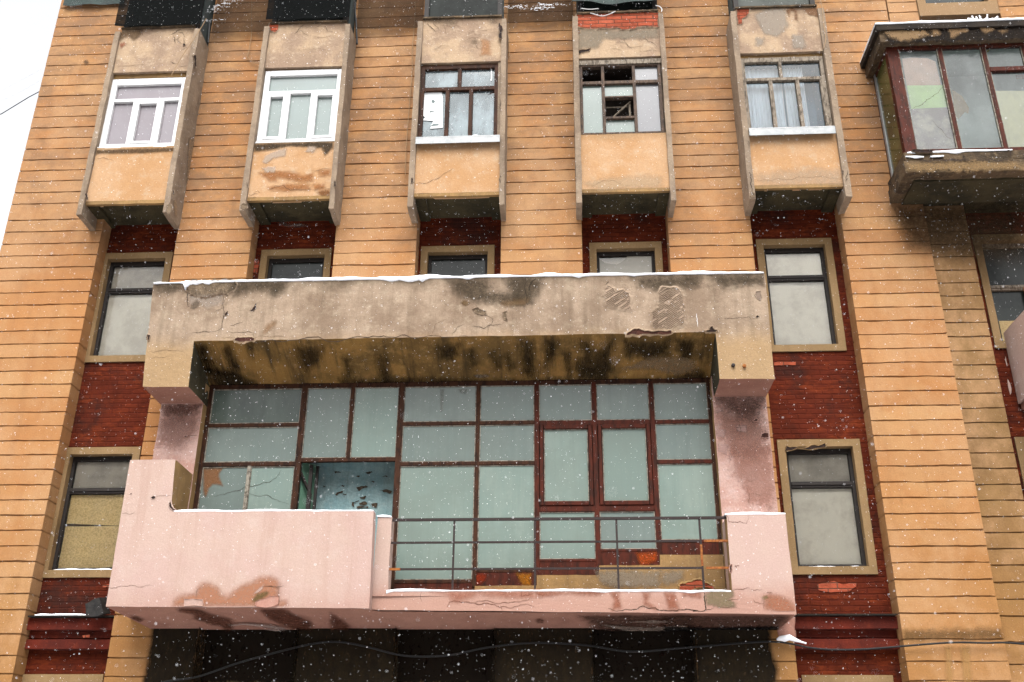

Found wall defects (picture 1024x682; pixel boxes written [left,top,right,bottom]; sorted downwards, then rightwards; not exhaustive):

peeling [263,149,286,172]
flaking render [625,284,687,338]
crack [150,296,499,358]
leakage [298,347,320,372]
leakage [625,341,705,379]
leakage [342,341,612,411]
leakage [717,396,764,420]
corrosion [637,552,657,565]
corrosion [518,574,531,585]
peeling [184,599,204,607]
peeling [255,596,279,608]